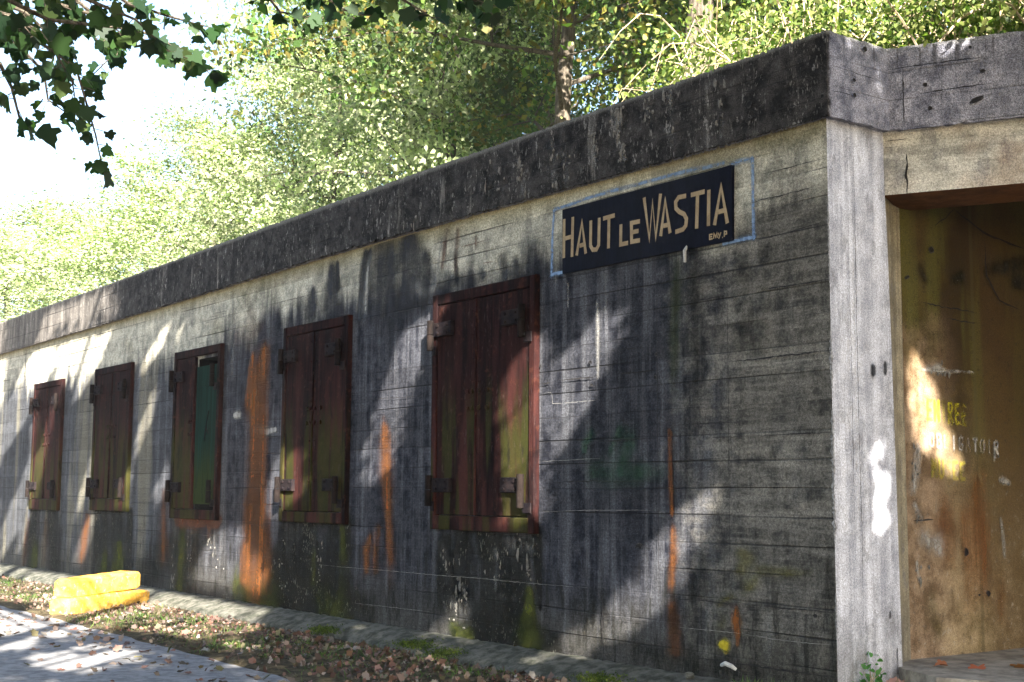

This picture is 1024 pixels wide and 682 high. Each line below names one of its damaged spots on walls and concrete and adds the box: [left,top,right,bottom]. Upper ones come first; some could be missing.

crack [831,37,990,191]
rust [241,346,269,601]
rust [364,426,391,573]
rust [669,529,677,587]